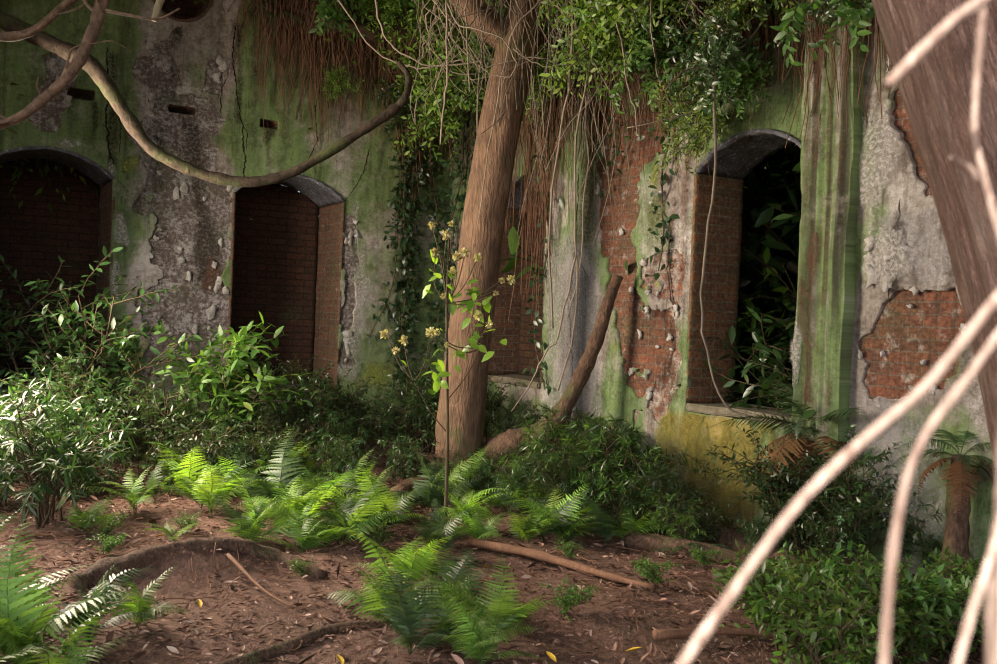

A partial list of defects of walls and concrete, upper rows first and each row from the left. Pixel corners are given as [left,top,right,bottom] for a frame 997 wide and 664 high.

peeling [29,53,78,132]
flaking render [127,27,234,377]
flaking render [595,95,686,423]
leakage [791,222,827,404]
flaking render [892,89,932,196]
flaking render [858,286,967,399]